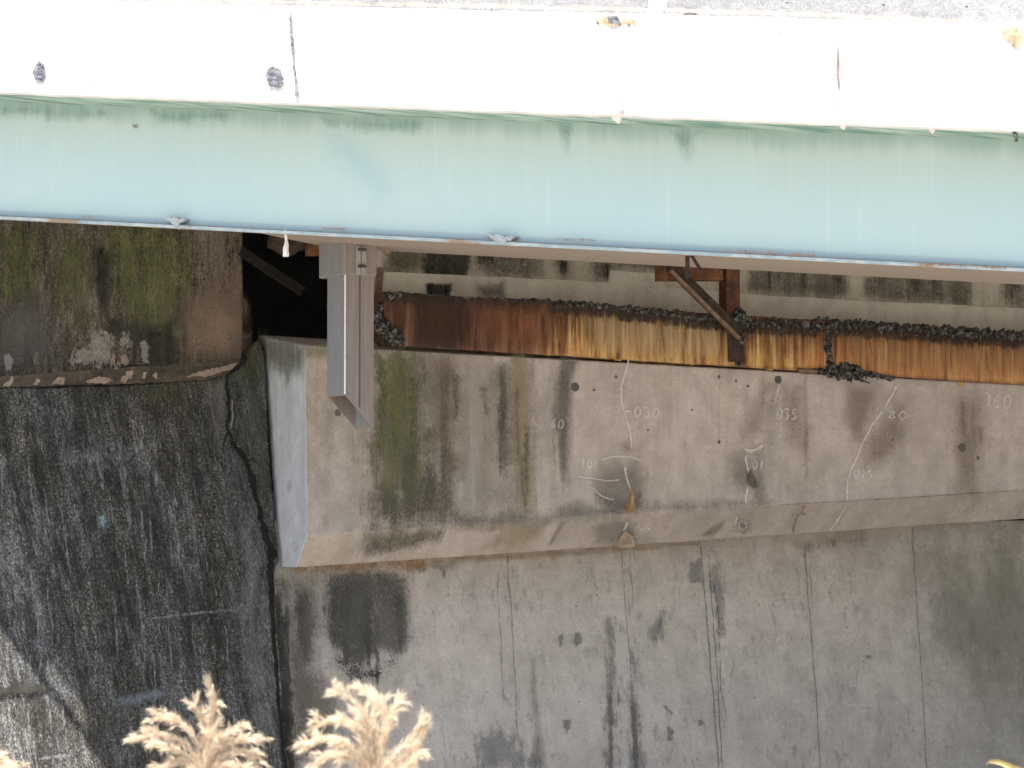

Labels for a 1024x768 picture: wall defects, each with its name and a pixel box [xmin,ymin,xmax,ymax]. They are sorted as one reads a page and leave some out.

peeling [33,377,65,385]
peeling [69,329,157,384]
damp [96,249,188,366]
peeling [186,363,237,377]
damp [61,437,152,551]
damp [124,545,238,664]
crack [222,355,288,768]
damp [275,571,408,768]
damp [365,367,526,553]
damp [604,619,644,768]
crack [701,551,726,765]
crack [785,386,1015,766]